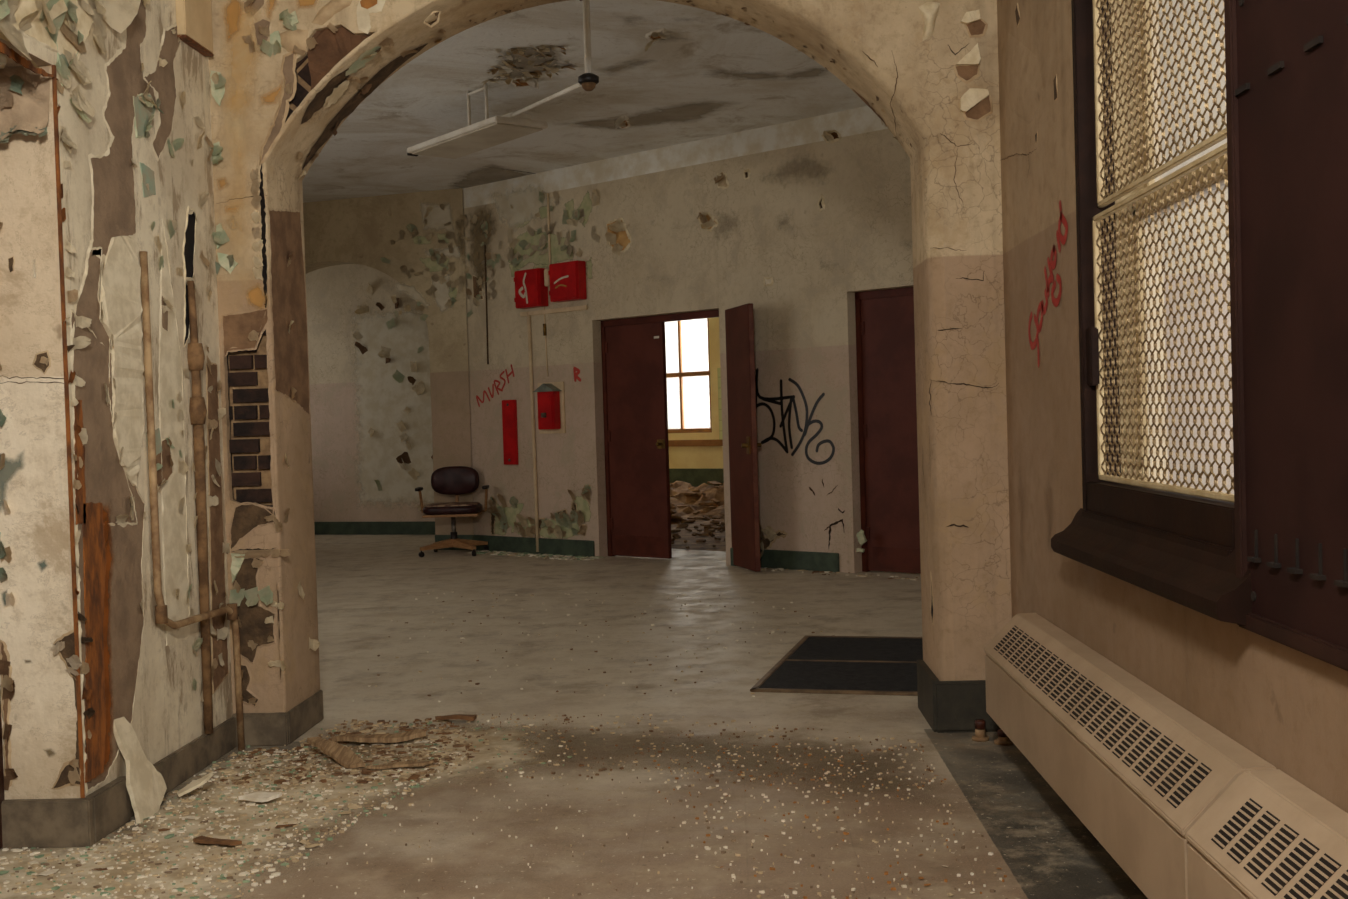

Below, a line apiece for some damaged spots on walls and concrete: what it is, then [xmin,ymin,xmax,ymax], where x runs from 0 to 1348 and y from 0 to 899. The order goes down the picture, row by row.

spalling [242,0,446,180]
peeling [481,45,576,89]
peeling [666,0,912,158]
peeling [954,10,993,122]
spalling [0,0,310,794]
peeling [353,189,632,511]
peeling [487,484,591,539]